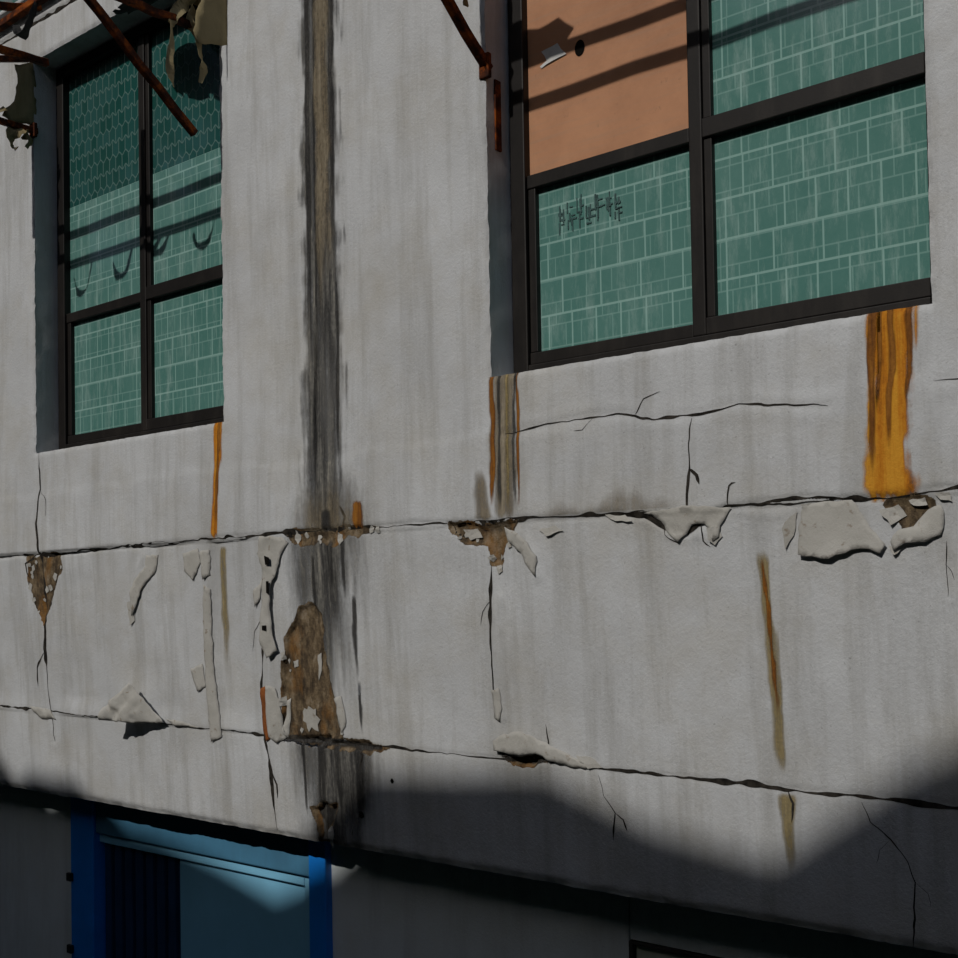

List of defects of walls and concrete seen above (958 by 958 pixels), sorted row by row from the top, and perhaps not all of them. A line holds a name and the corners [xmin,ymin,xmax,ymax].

spalling [253,523,390,756]
water stain [293,0,363,682]
crack [0,392,828,739]
rust [489,373,520,517]
rust [758,557,785,762]
crack [723,482,958,507]
peeling [782,492,952,559]
rust [864,306,917,501]
water stain [298,742,372,849]
crack [153,722,564,827]
peeling [492,731,603,769]
crack [594,768,958,946]